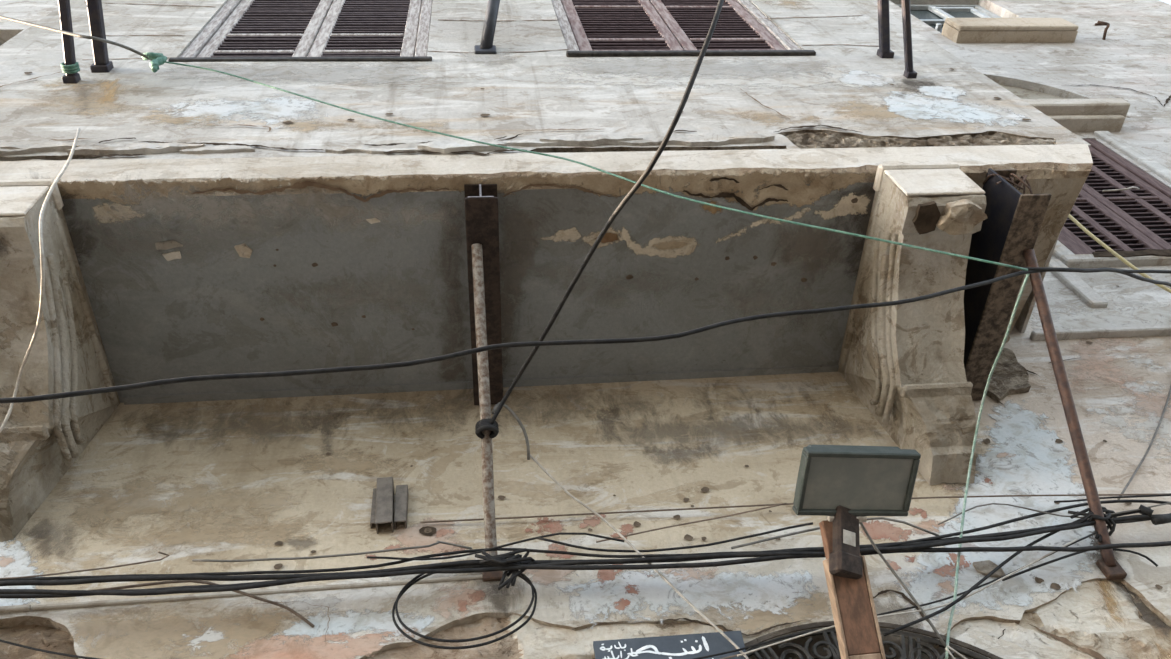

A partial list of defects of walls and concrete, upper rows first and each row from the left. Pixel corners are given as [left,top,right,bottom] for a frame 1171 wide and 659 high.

spalling [530,65,1057,153]
damp [836,101,922,120]
damp [904,80,934,89]
spalling [57,170,876,211]
peeling [1029,303,1171,464]
peeling [860,337,1171,659]
spalling [0,538,79,659]
spalling [225,514,817,659]